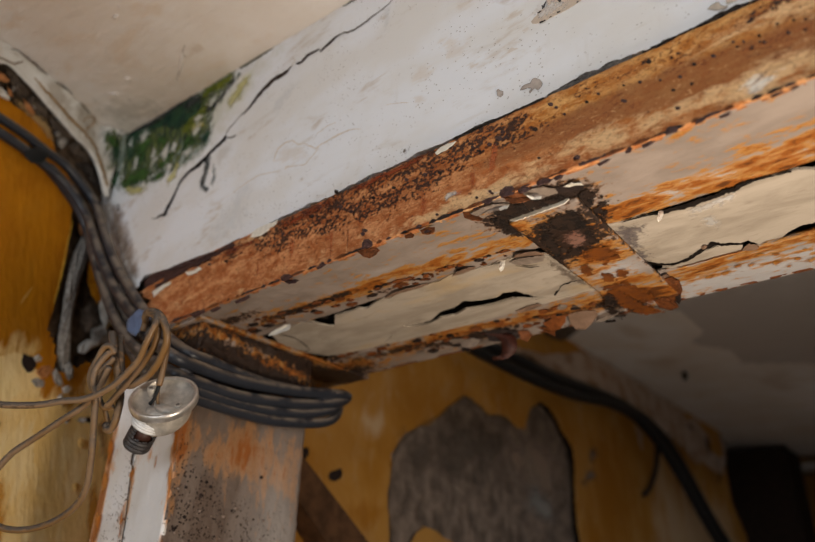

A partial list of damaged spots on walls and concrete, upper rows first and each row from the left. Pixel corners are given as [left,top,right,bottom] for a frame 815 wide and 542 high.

spalling [642,0,759,53]
spalling [0,64,103,206]
water stain [75,25,321,288]
crack [151,0,392,219]
corrosion [400,169,610,239]
spalling [451,56,633,141]
corrosion [573,105,734,166]
crack [623,171,792,222]
corrosion [171,229,391,322]
corrosion [401,210,683,361]
crack [647,242,759,268]
flaking render [388,396,575,542]